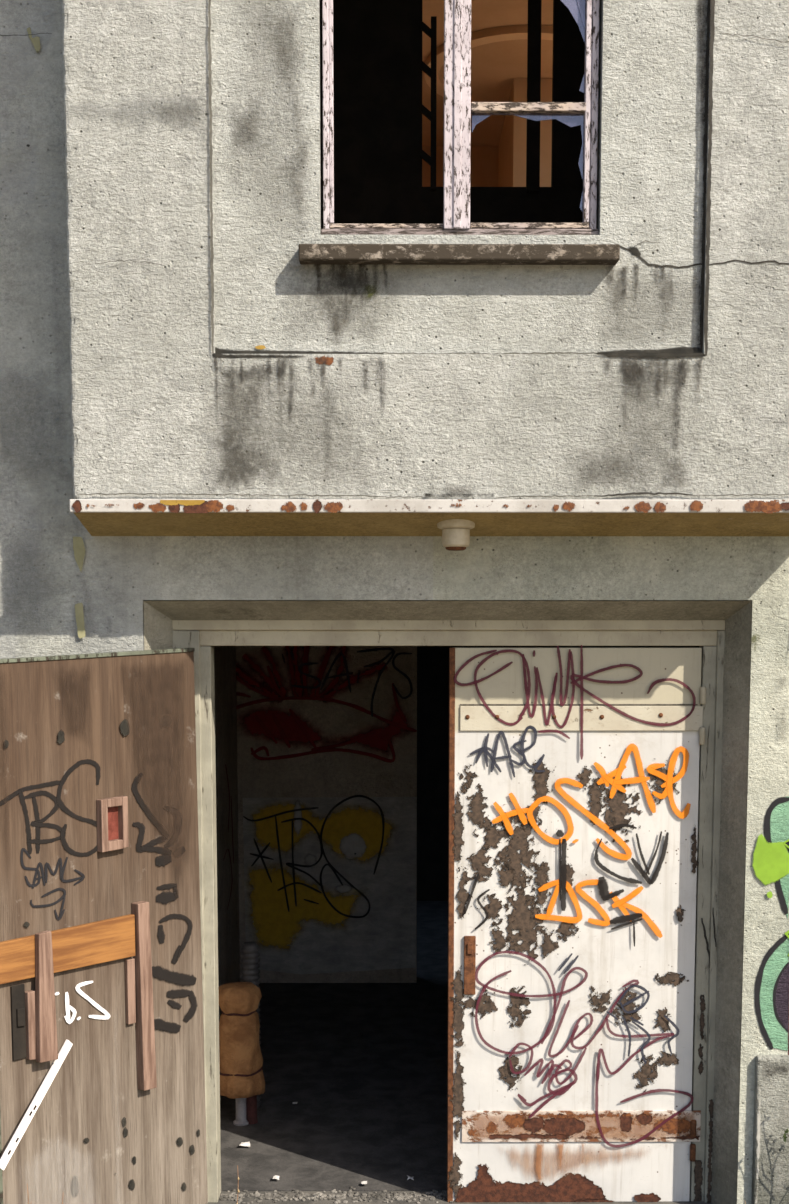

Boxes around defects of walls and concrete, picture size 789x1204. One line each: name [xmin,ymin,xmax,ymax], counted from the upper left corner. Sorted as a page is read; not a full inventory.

leakage [596,0,715,445]
crack [620,241,789,268]
rust [72,500,119,513]
rust [134,500,235,513]
rust [281,500,343,513]
rust [553,501,575,512]
rust [623,501,666,513]
rust [690,500,703,512]
rust [744,500,789,513]